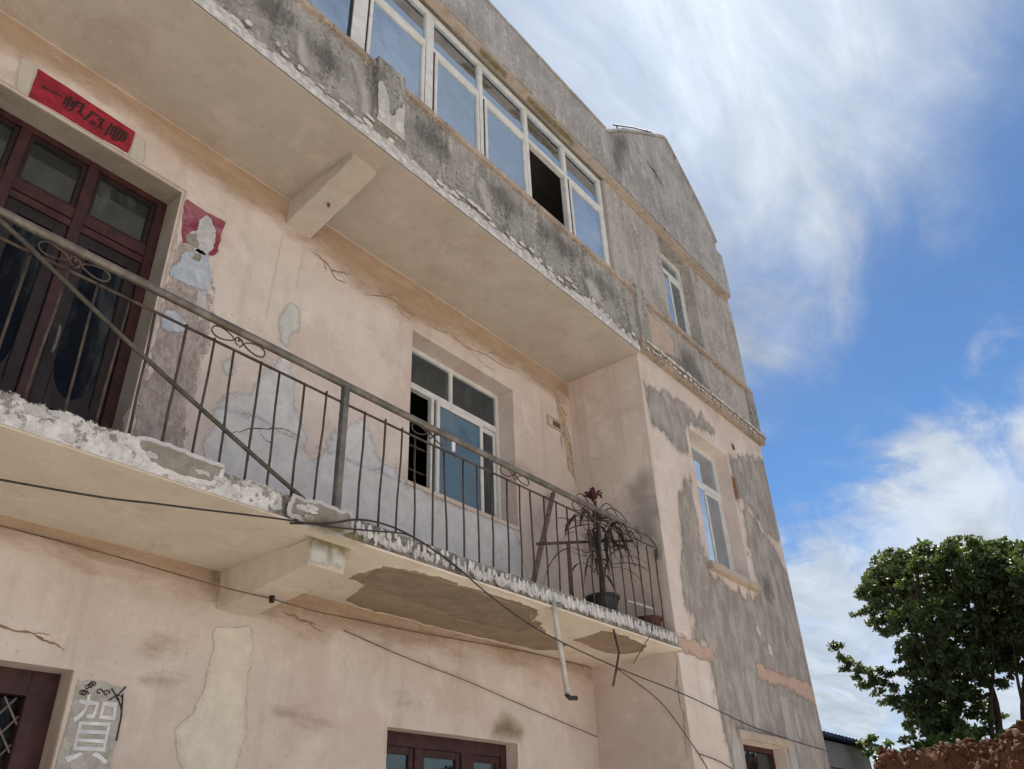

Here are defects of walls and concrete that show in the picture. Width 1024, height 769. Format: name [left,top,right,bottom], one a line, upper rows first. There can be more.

water stain [0,11,289,221]
water stain [353,64,370,117]
water stain [528,99,573,144]
peeling [193,0,765,439]
crack [265,236,520,373]
water stain [305,224,569,395]
water stain [585,278,604,307]
peeling [644,384,715,455]
peeling [0,357,678,655]
crack [0,624,64,651]
peeling [175,625,253,769]
peeling [678,443,830,769]